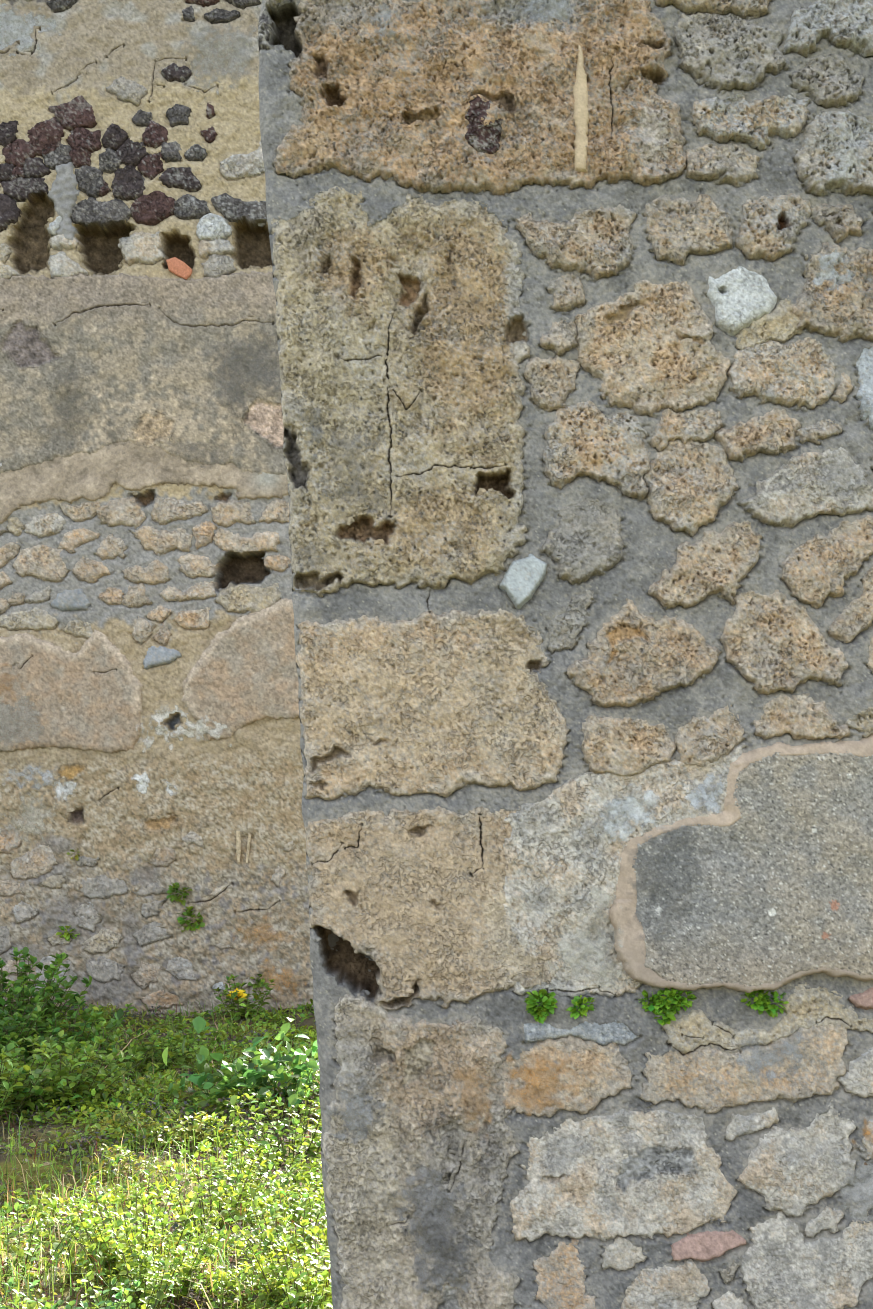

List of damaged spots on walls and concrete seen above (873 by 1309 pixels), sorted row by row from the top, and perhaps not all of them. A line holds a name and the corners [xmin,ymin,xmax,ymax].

crack [53,300,273,331]
spalling [310,925,421,1010]